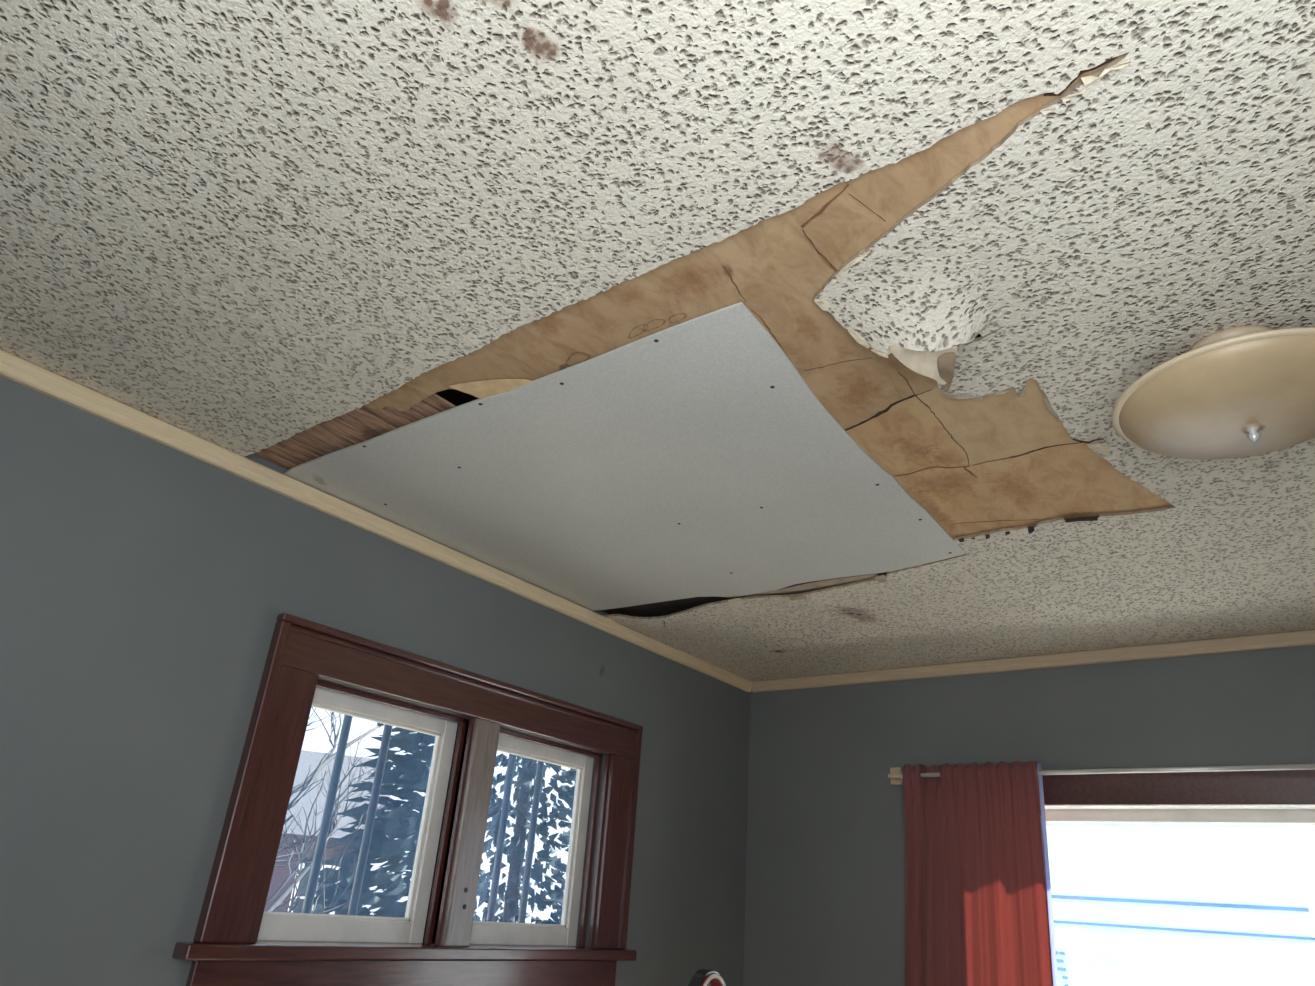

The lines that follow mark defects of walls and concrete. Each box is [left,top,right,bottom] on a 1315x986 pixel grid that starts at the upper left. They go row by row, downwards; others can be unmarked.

water stain [424,0,448,18]
water stain [524,29,555,55]
peeling [253,54,1172,542]